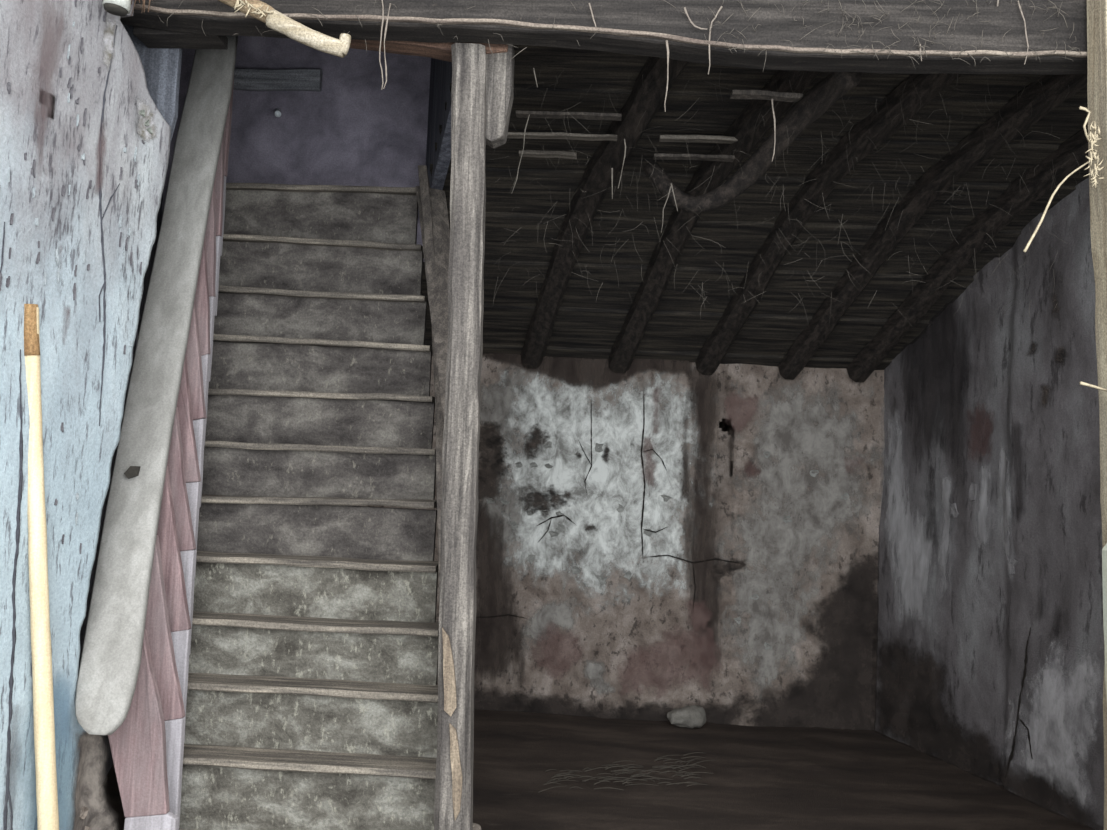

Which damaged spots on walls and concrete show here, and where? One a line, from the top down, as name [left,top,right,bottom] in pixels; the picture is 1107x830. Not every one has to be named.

crack [99,25,120,426]
crack [535,515,576,541]
damp [474,504,673,721]
crack [579,399,592,493]
damp [482,353,746,665]
crack [641,402,744,607]
damp [701,421,1099,827]
damp [902,299,975,454]
crack [1003,627,1032,790]